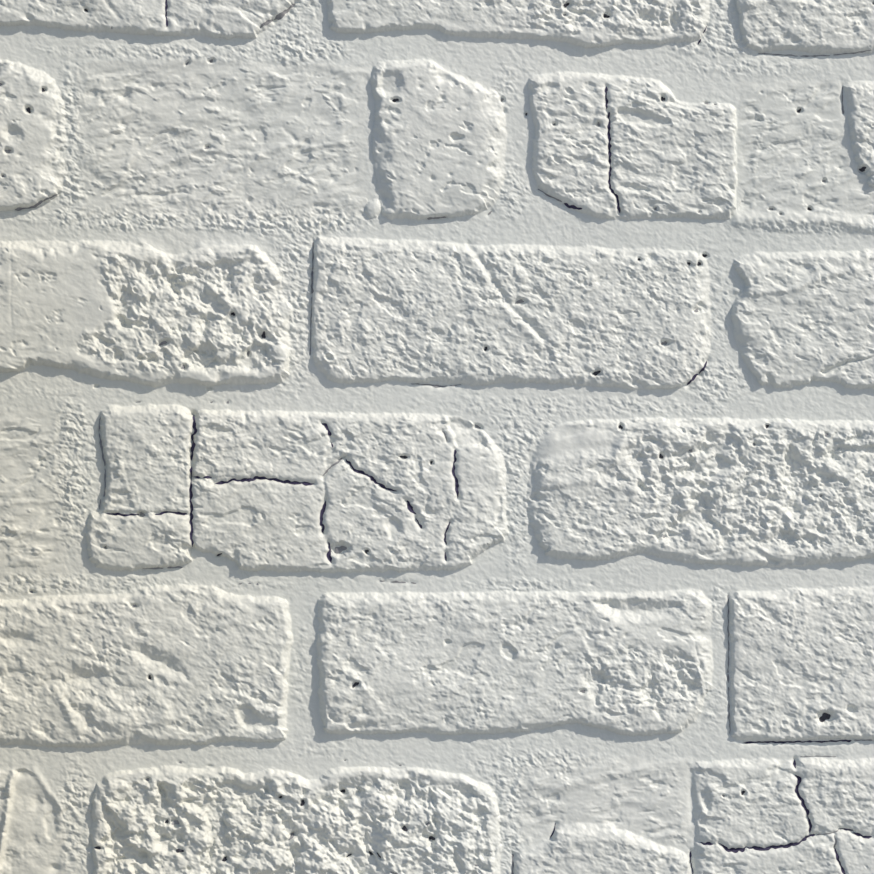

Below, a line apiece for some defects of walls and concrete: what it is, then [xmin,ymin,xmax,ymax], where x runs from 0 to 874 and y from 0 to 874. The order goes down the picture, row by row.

crack [162,0,170,27]
crack [260,3,295,28]
crack [605,87,621,213]
crack [106,415,422,563]
crack [442,431,459,498]
crack [689,759,872,874]